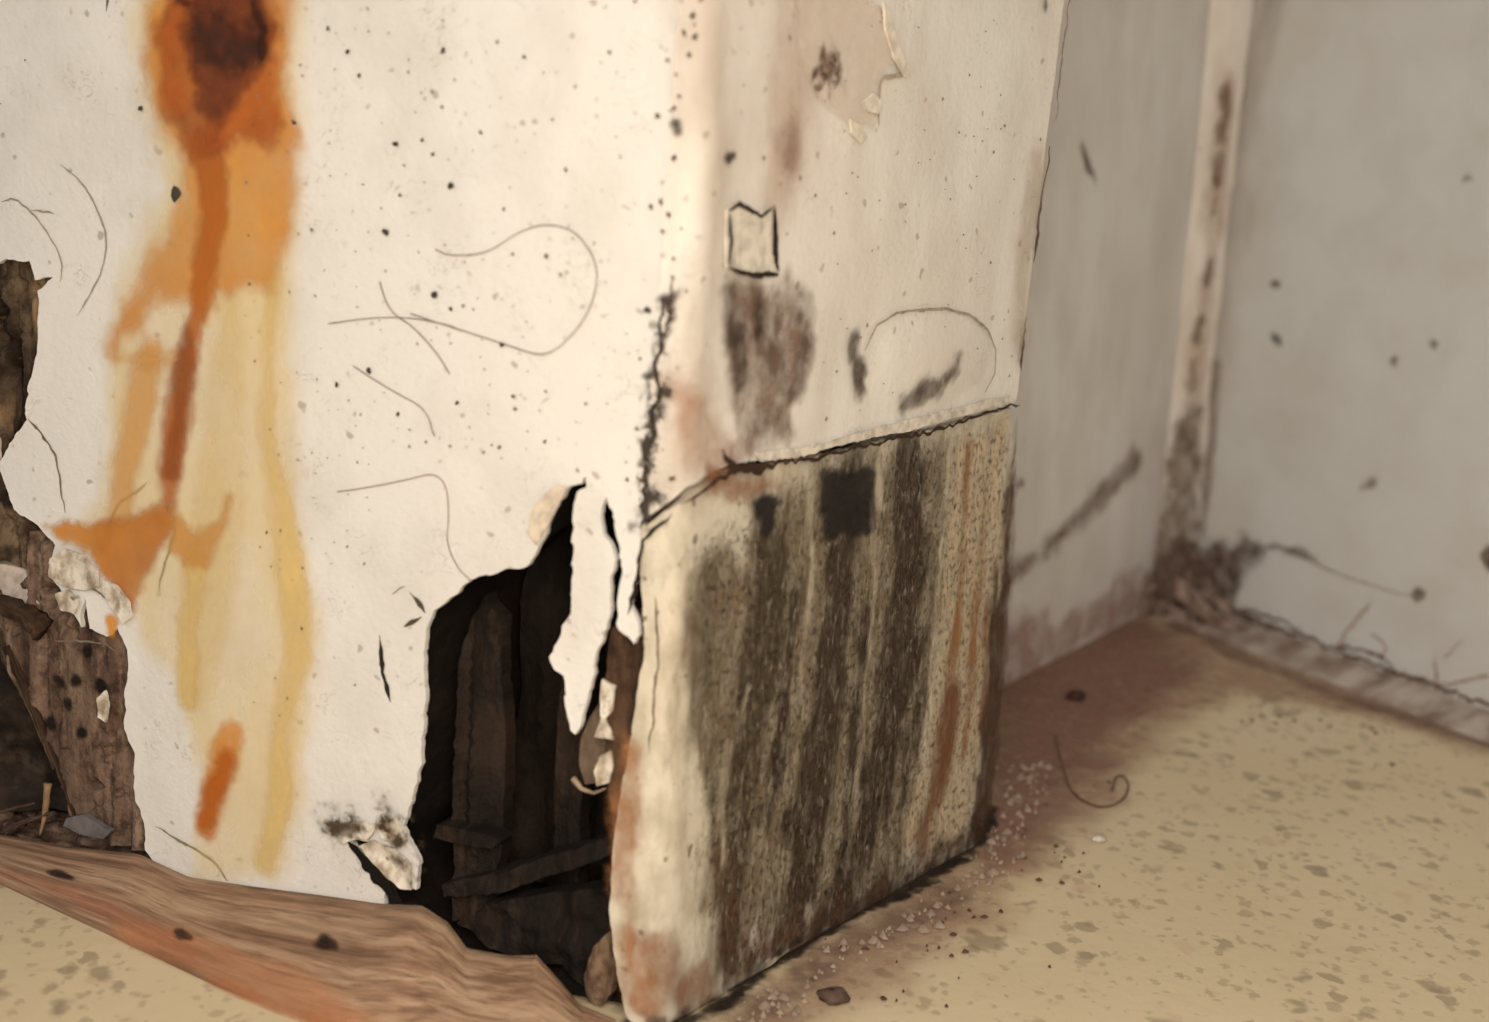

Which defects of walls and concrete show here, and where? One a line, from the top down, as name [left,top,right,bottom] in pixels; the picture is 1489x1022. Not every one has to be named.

peeling [0,549,134,624]
peeling [96,690,110,723]
rust [53,0,298,706]
rust [198,725,239,836]
rust [258,426,309,869]
spalling [321,480,644,1007]
peeling [724,201,779,279]
mould [728,281,813,444]
crack [627,279,1027,751]
water stain [900,357,959,411]
crack [1033,0,1070,262]
water stain [687,380,1489,1022]